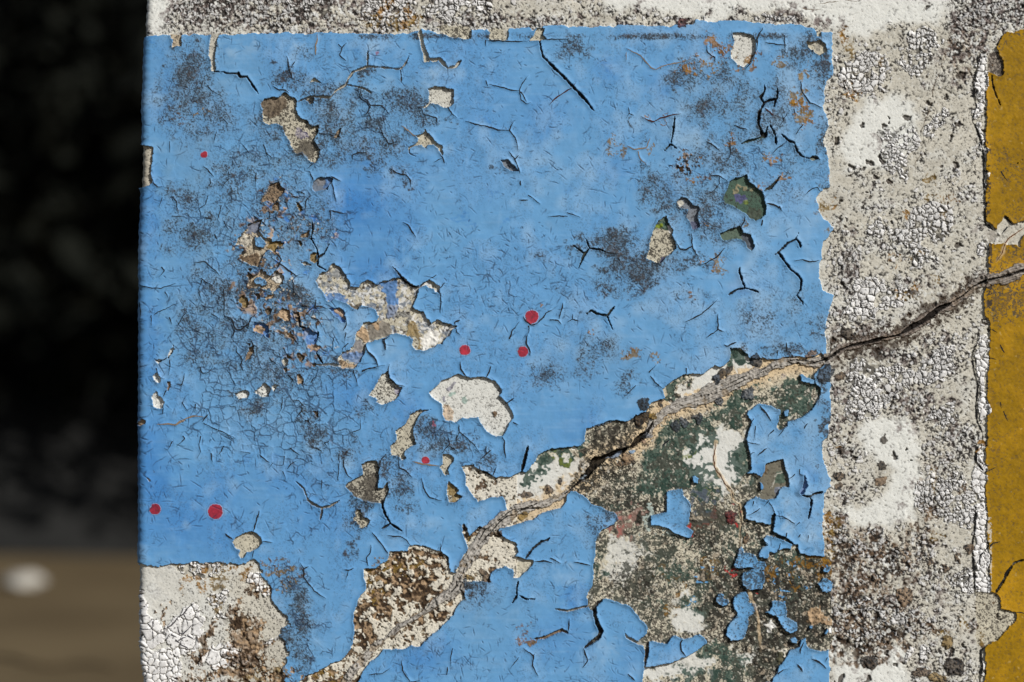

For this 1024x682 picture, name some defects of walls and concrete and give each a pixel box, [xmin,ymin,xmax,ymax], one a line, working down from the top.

peeling [731,12,807,68]
peeling [261,92,320,163]
peeling [262,182,285,212]
peeling [312,177,333,192]
peeling [647,216,677,263]
peeling [720,175,767,251]
peeling [236,221,322,385]
peeling [298,231,457,369]
crack [341,28,1024,682]
peeling [299,348,833,682]
crack [139,600,196,650]
peeling [138,531,291,682]